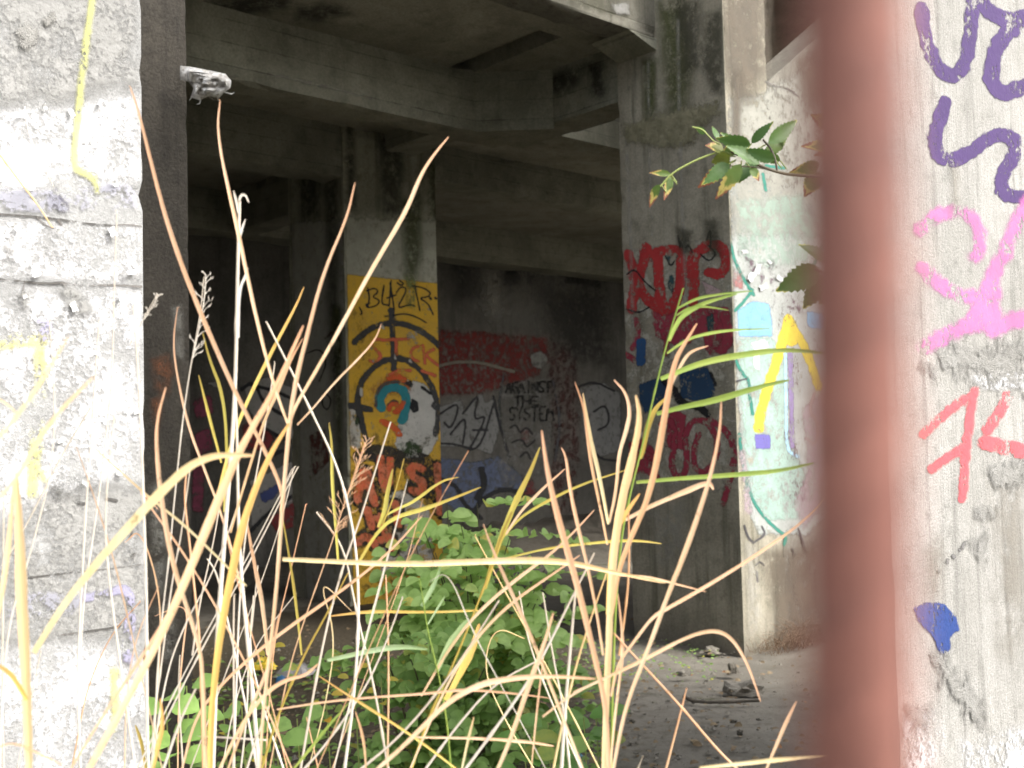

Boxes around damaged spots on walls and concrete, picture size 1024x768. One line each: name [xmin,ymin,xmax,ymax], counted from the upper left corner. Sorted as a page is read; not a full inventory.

leakage [643,0,766,136]
peeling [733,243,783,292]